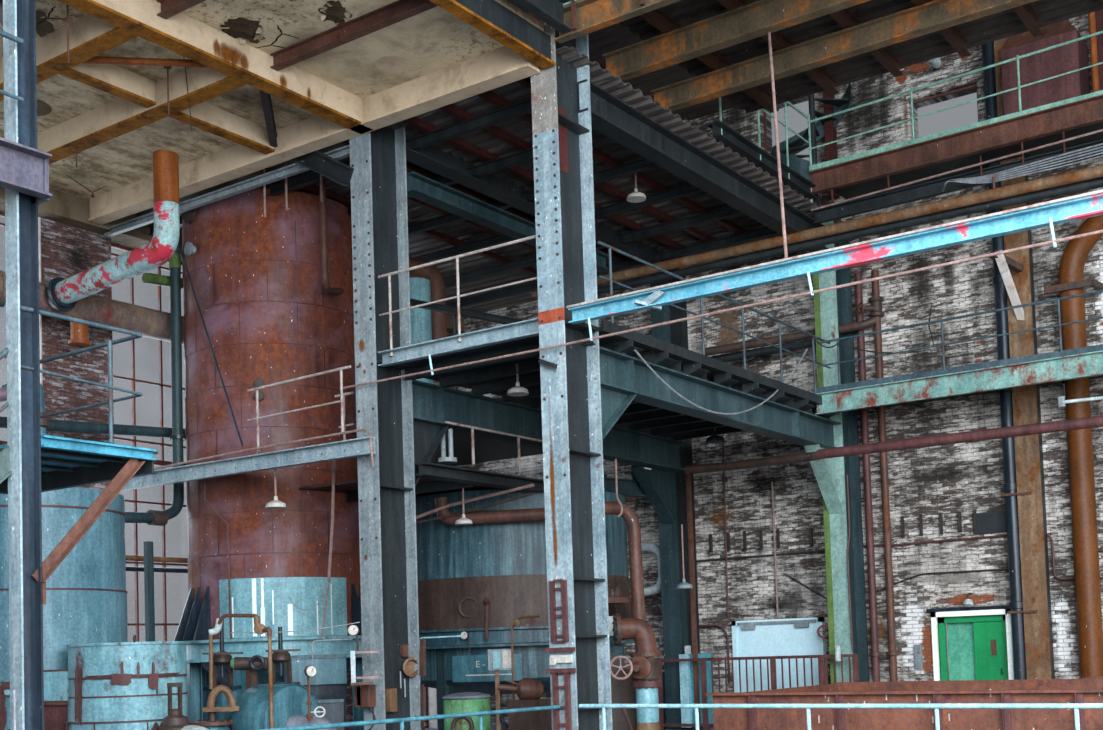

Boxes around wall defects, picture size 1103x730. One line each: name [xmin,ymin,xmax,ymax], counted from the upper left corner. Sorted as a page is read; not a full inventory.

peeling [36,10,55,37]
spalling [219,17,265,45]
spalling [318,0,352,26]